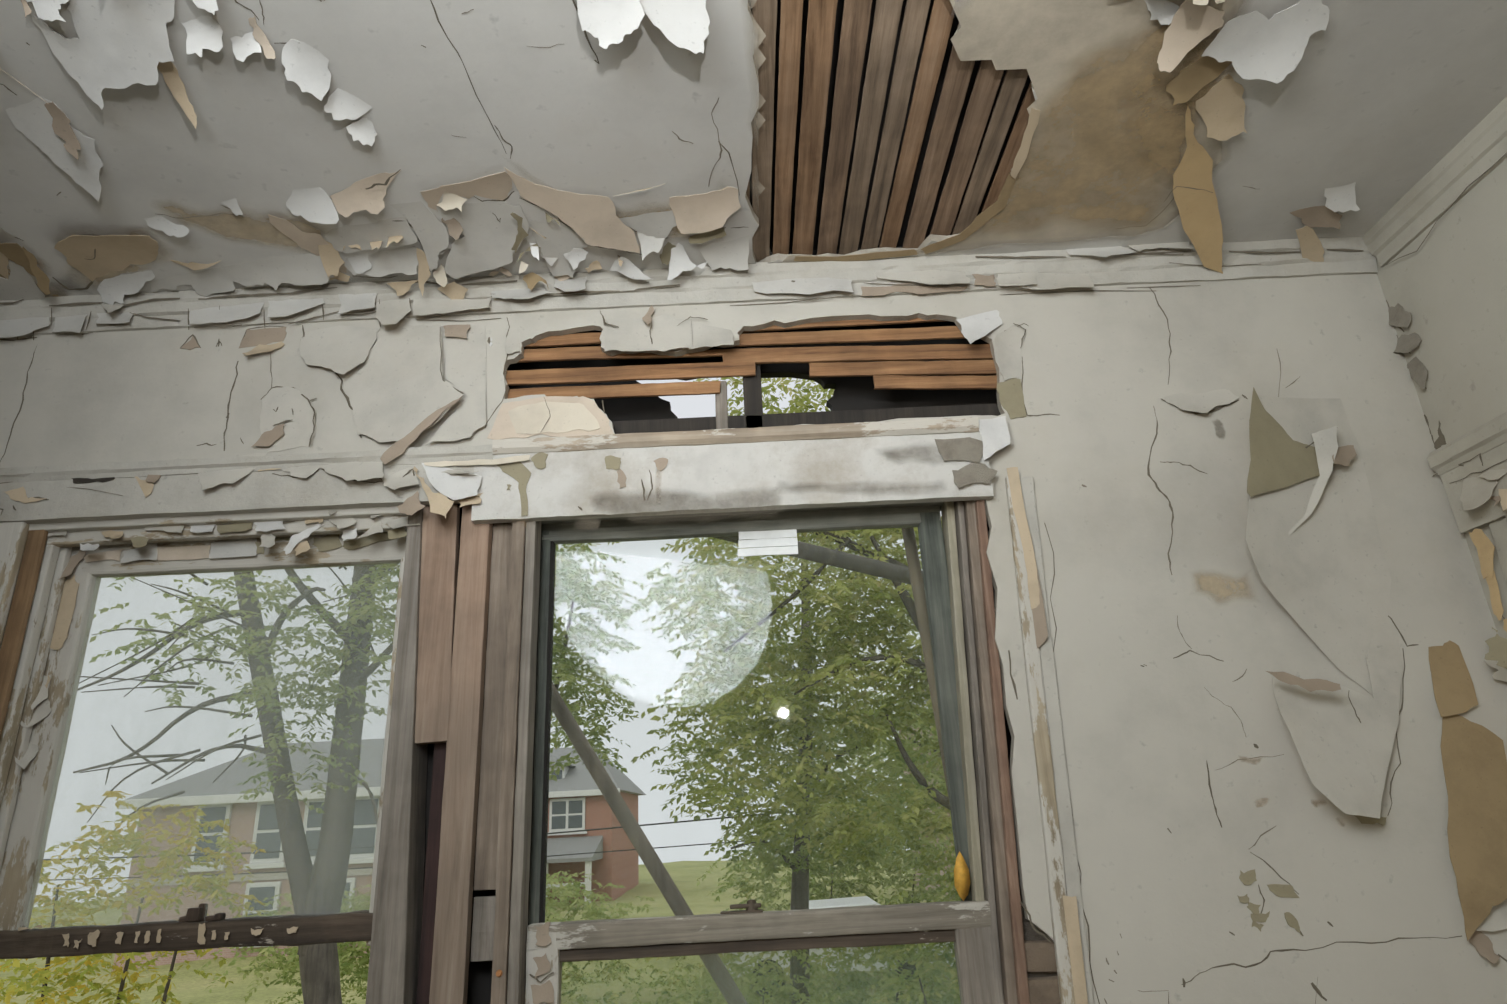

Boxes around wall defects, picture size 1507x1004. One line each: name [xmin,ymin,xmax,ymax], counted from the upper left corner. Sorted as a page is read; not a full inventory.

crack [421,0,513,159]
leakage [993,23,1185,226]
peeling [1290,182,1360,262]
crack [0,280,680,462]
flaking render [0,0,1330,650]
crack [975,153,1507,575]
spalling [1386,300,1428,389]
peeling [15,674,52,770]
crack [1008,650,1018,699]
peeling [1062,896,1107,1004]
crack [1077,858,1100,1004]
crack [1138,936,1462,1004]